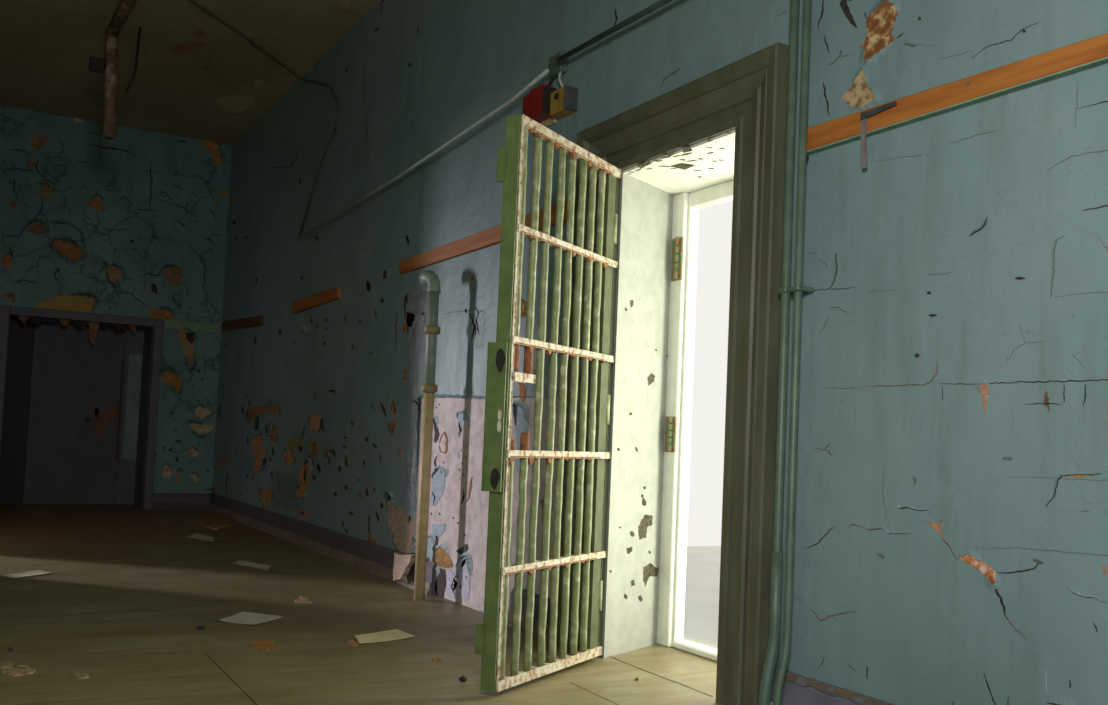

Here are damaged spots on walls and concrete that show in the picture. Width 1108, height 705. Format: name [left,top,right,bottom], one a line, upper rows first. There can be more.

flaking render [841,0,915,111]
crack [969,218,987,236]
crack [814,254,896,334]
crack [819,326,1108,407]
flaking render [334,291,489,611]
flaking render [508,369,559,607]
peeling [619,486,654,554]
crack [807,473,928,549]
crack [1005,471,1107,506]
peeling [624,551,659,602]
flaking render [957,549,1043,619]
crack [983,672,1009,705]